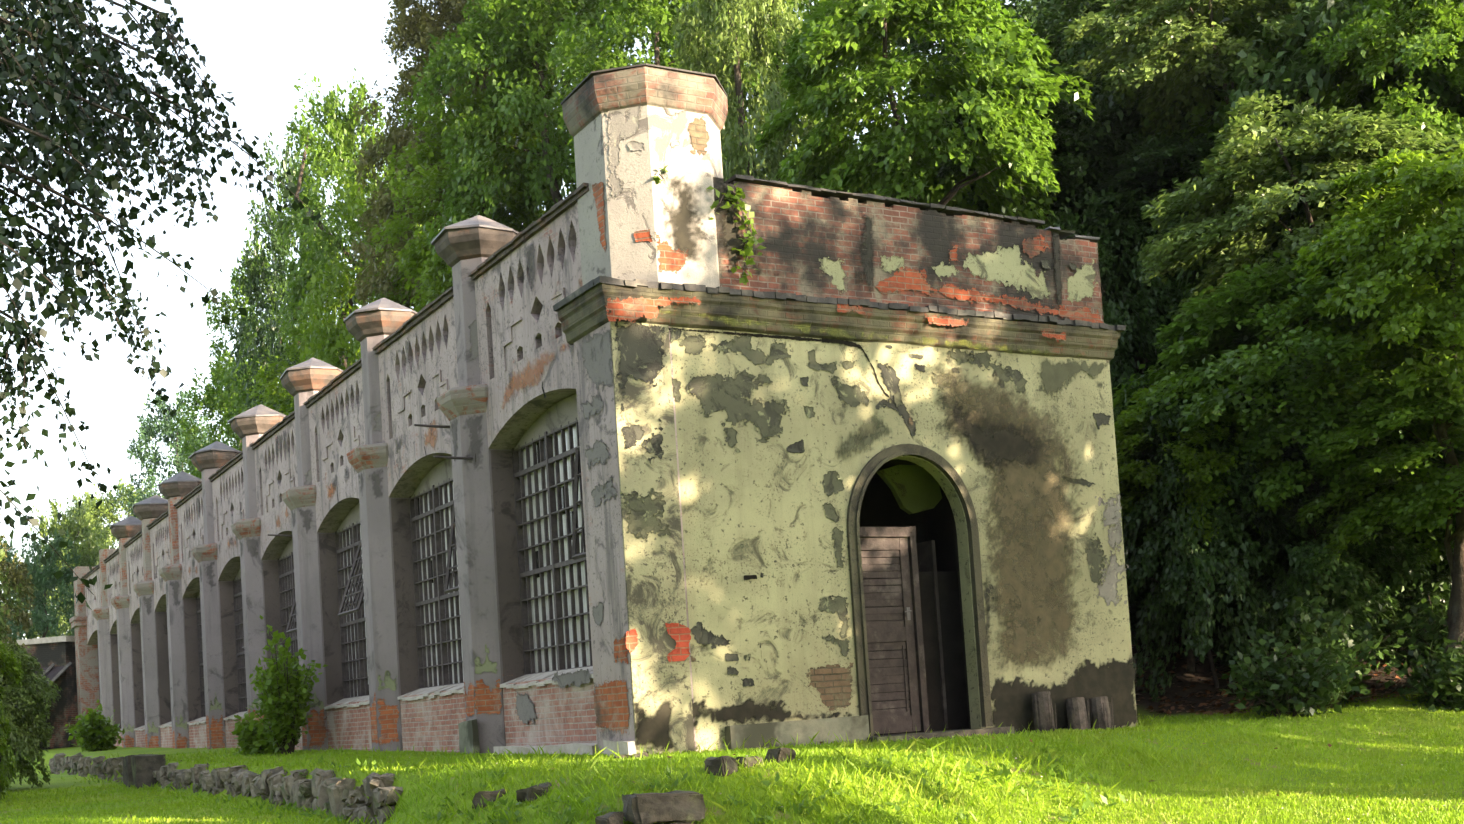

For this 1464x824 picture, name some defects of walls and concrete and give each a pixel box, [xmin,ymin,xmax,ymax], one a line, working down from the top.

spalling [634,229,687,274]
leakage [666,177,775,275]
peeling [818,256,865,315]
spalling [875,234,1103,342]
leakage [914,337,1138,733]
spalling [370,670,399,745]
spalling [464,644,536,725]
spalling [552,628,638,735]
leakage [633,695,676,752]
spalling [665,622,755,687]
leakage [692,696,852,743]
spalling [806,595,853,711]